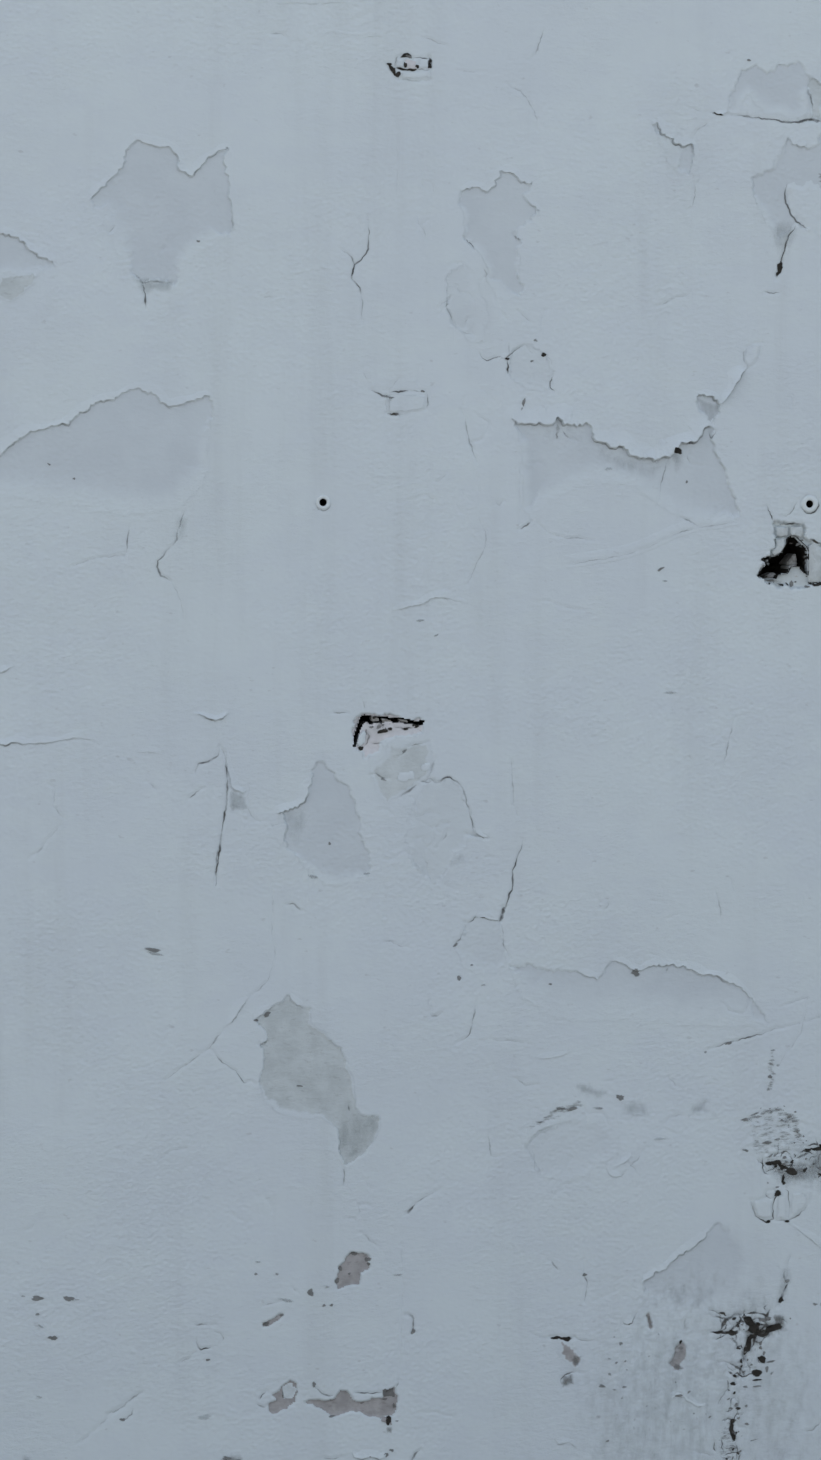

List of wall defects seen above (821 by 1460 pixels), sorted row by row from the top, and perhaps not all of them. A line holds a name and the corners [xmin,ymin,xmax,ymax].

peeling [651,119,699,175]
peeling [0,227,58,301]
peeling [88,133,240,303]
peeling [458,164,541,301]
peeling [0,382,214,518]
peeling [502,365,747,521]
spalling [757,510,821,589]
spalling [353,714,424,747]
peeling [270,760,371,887]
peeling [510,957,768,1028]
flaking render [252,993,380,1166]
spalling [261,1381,398,1431]